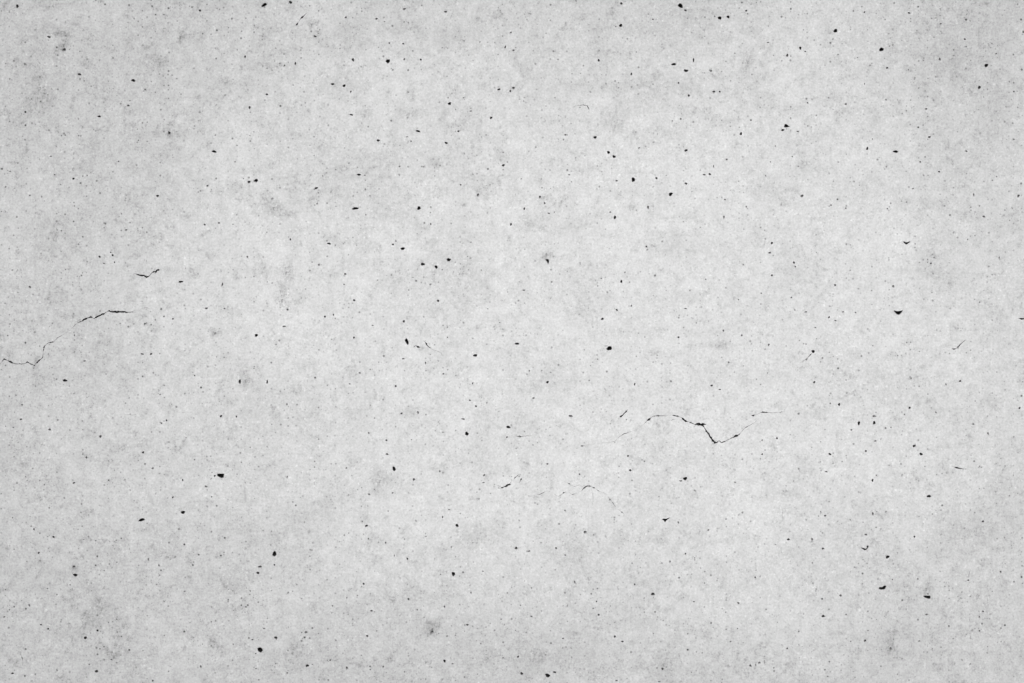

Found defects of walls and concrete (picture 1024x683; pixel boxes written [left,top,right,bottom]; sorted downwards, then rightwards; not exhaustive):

crack [0,307,146,366]
crack [581,411,781,447]